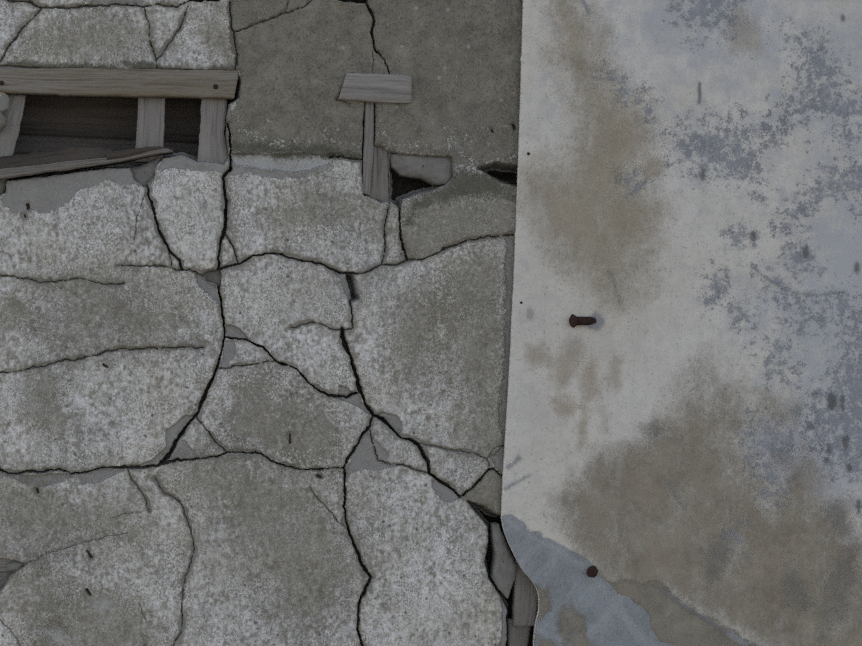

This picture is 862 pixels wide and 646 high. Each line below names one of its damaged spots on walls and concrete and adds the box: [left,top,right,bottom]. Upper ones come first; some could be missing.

crack [0,0,312,70]
crack [0,122,514,646]
crack [338,0,389,73]
flaking render [154,0,672,646]
water stain [528,0,660,303]
peeling [665,0,744,46]
water stain [562,394,862,646]
peeling [592,19,862,507]